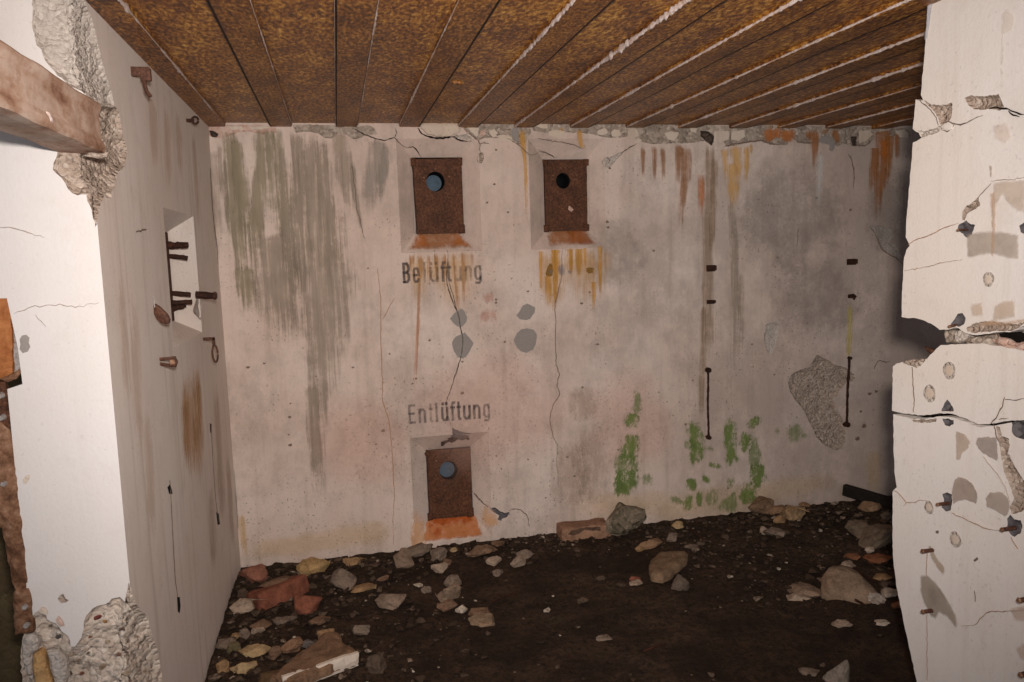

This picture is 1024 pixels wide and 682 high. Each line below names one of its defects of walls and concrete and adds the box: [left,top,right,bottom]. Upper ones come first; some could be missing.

spalling [32,0,127,227]
rust [641,147,690,205]
spalling [420,100,954,163]
spalling [965,94,1004,111]
leakage [224,115,388,467]
rust [410,233,467,285]
crack [446,251,463,426]
crack [550,249,563,481]
rust [539,231,602,301]
rust [411,509,496,545]
spalling [996,420,1024,537]
spalling [20,583,163,682]